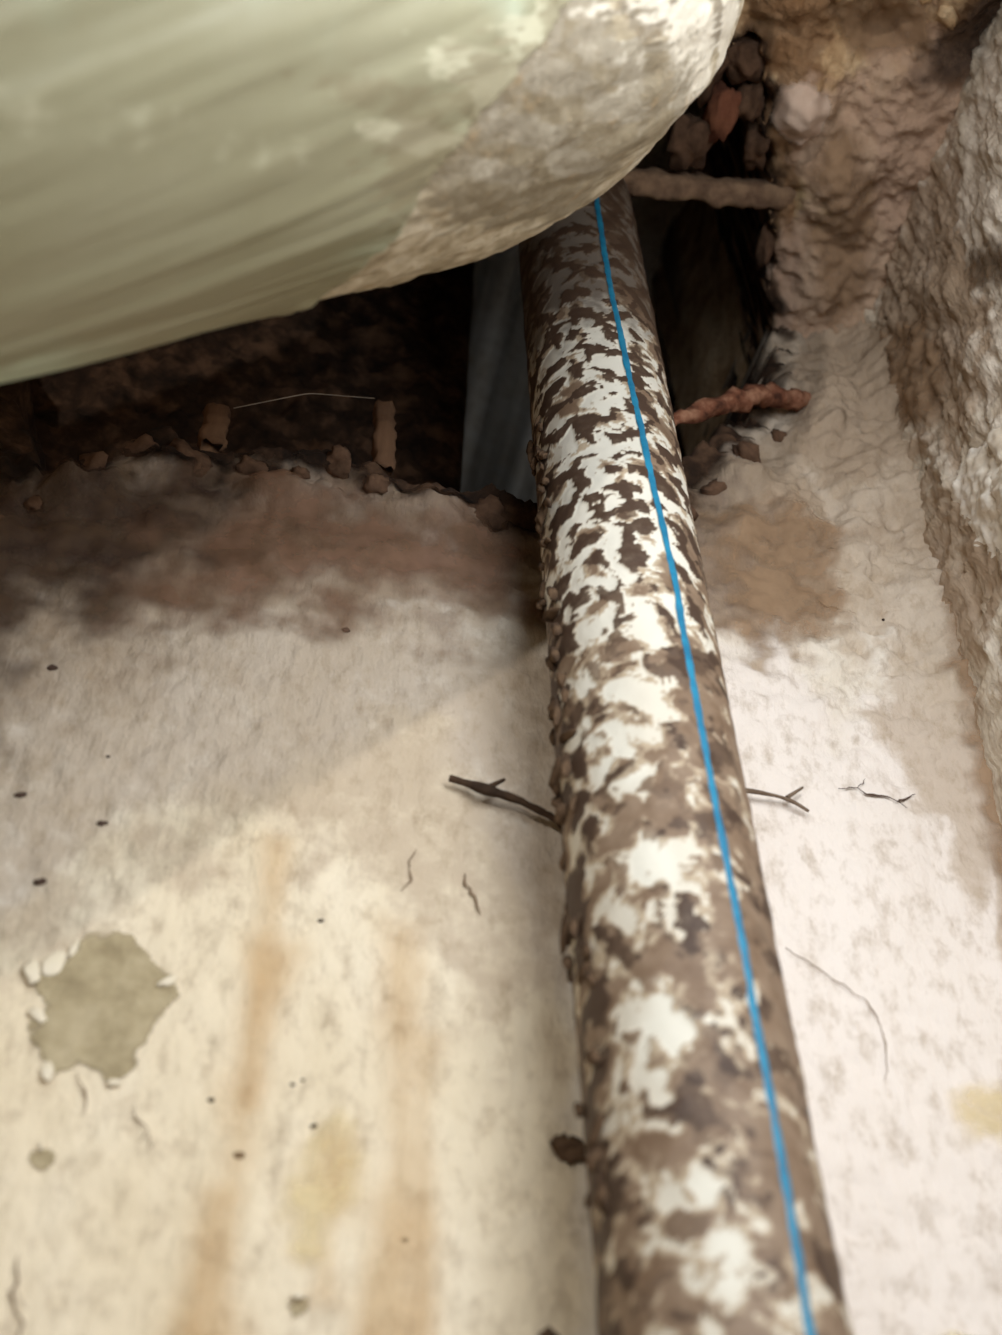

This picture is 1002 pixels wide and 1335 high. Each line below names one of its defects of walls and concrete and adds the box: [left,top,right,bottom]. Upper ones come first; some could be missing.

peeling [22,931,179,1087]